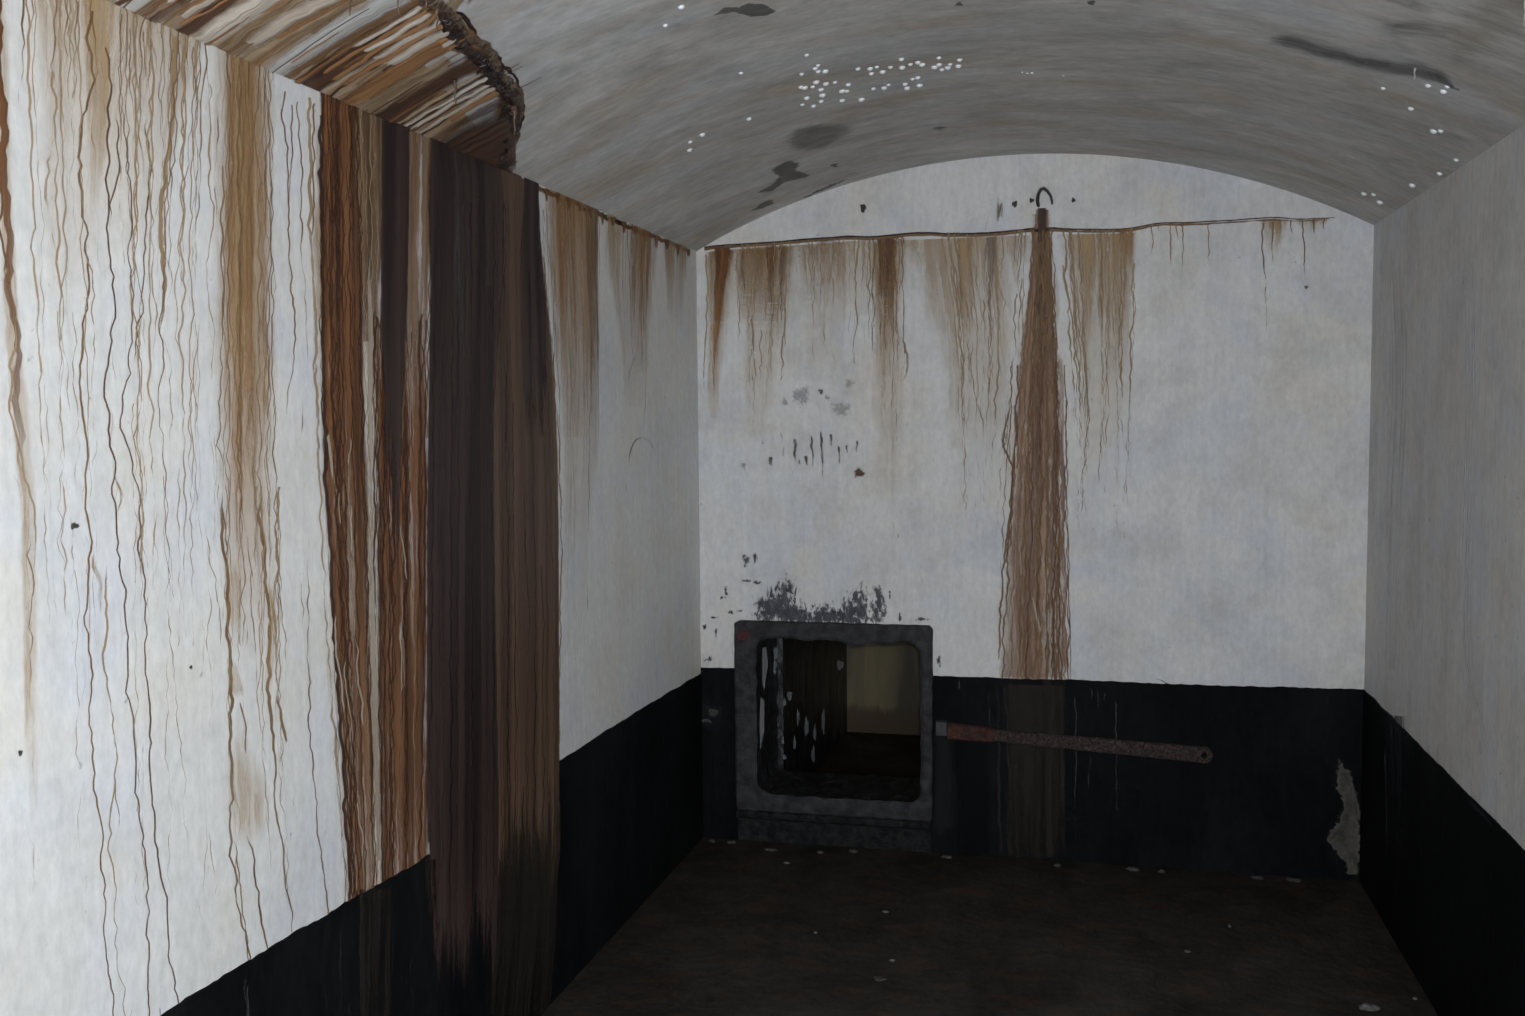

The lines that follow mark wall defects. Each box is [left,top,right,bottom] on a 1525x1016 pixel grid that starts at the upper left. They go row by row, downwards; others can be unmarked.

rust [1151,224,1184,265]
rust [1261,218,1328,303]
rust [523,179,1136,680]
rust [0,0,431,1016]
rust [936,720,1213,764]
peeling [1327,759,1361,875]